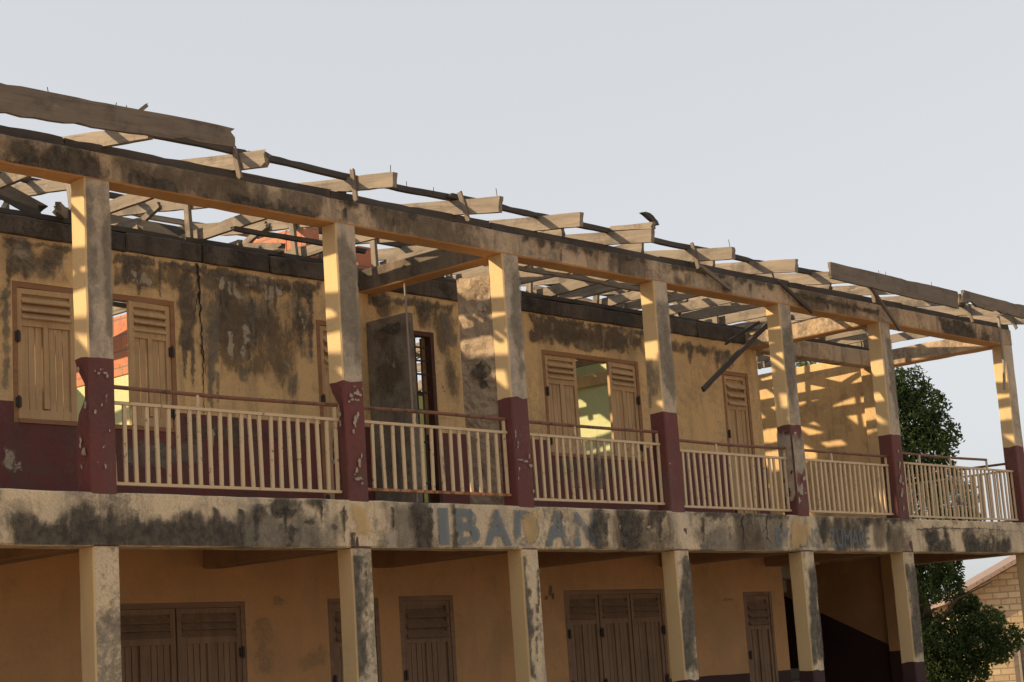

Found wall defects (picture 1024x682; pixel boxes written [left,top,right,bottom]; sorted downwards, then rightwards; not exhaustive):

leakage [2,139,323,470]
crack [194,263,226,412]
peeling [227,324,253,358]
leakage [511,271,644,372]
spalling [4,450,20,470]
peeling [331,386,363,474]
leakage [588,508,672,550]
leakage [695,512,789,551]
leakage [924,526,1011,552]
leakage [7,498,368,677]
leakage [523,557,540,679]